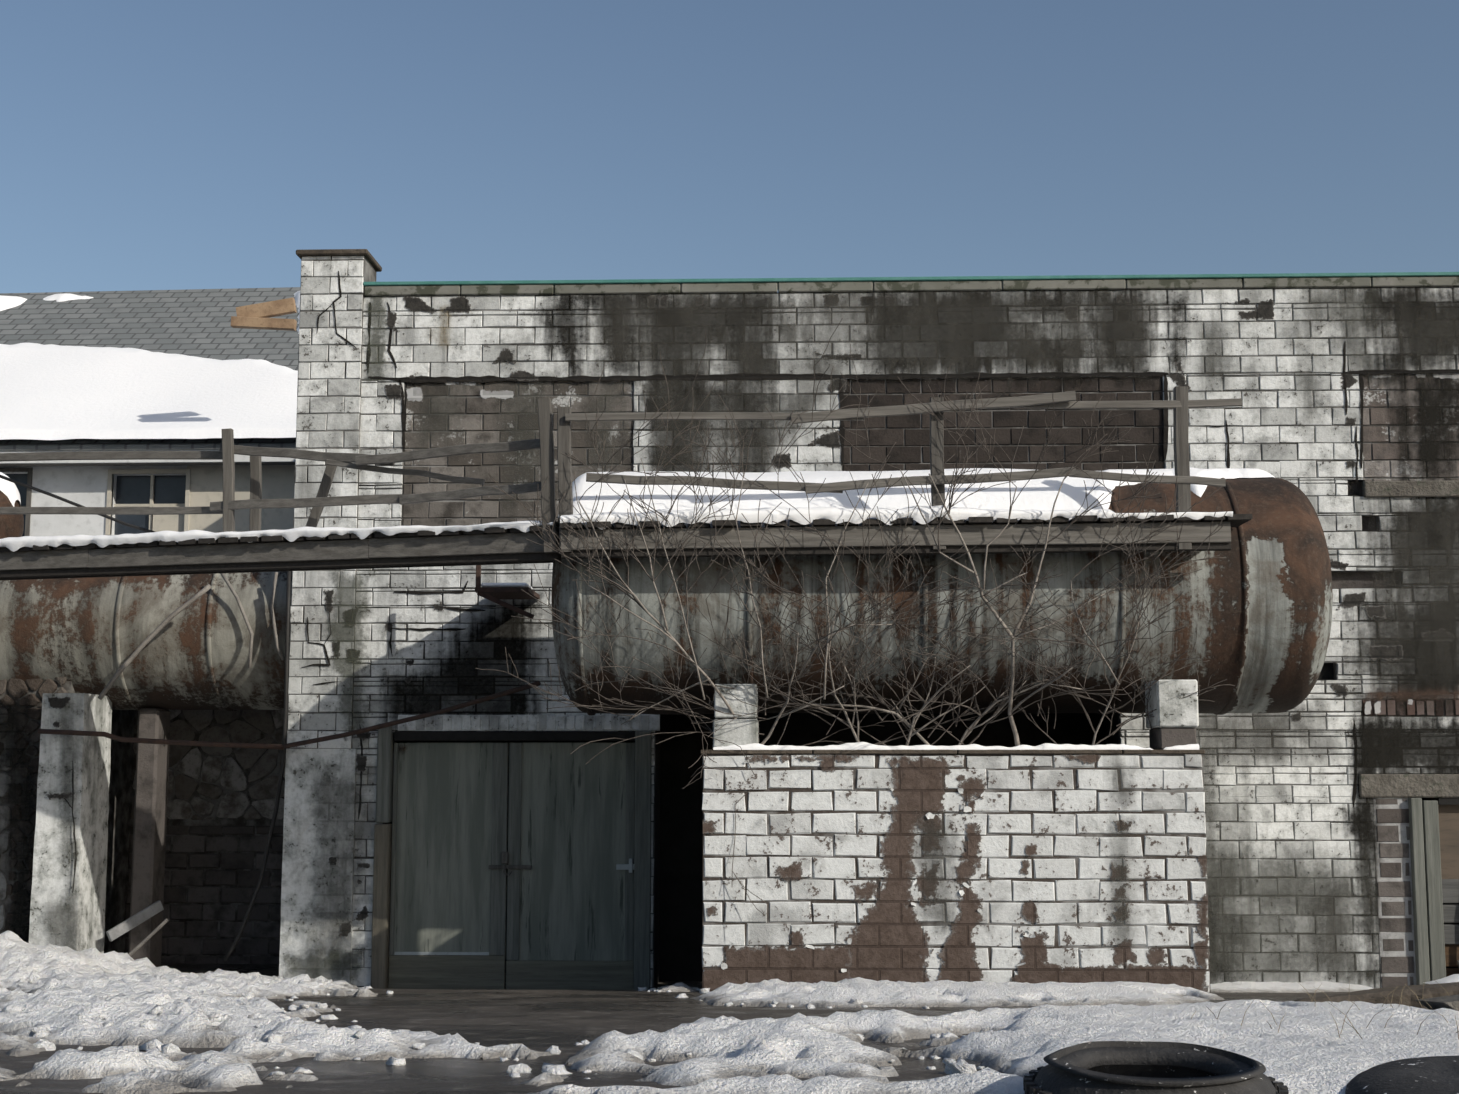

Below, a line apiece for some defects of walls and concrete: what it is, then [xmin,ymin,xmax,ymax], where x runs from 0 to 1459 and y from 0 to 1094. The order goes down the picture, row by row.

crack [317,271,1169,465]
damp [541,289,1186,472]
crack [1207,420,1230,468]
damp [1305,287,1459,481]
damp [384,601,537,717]
damp [1202,497,1459,985]